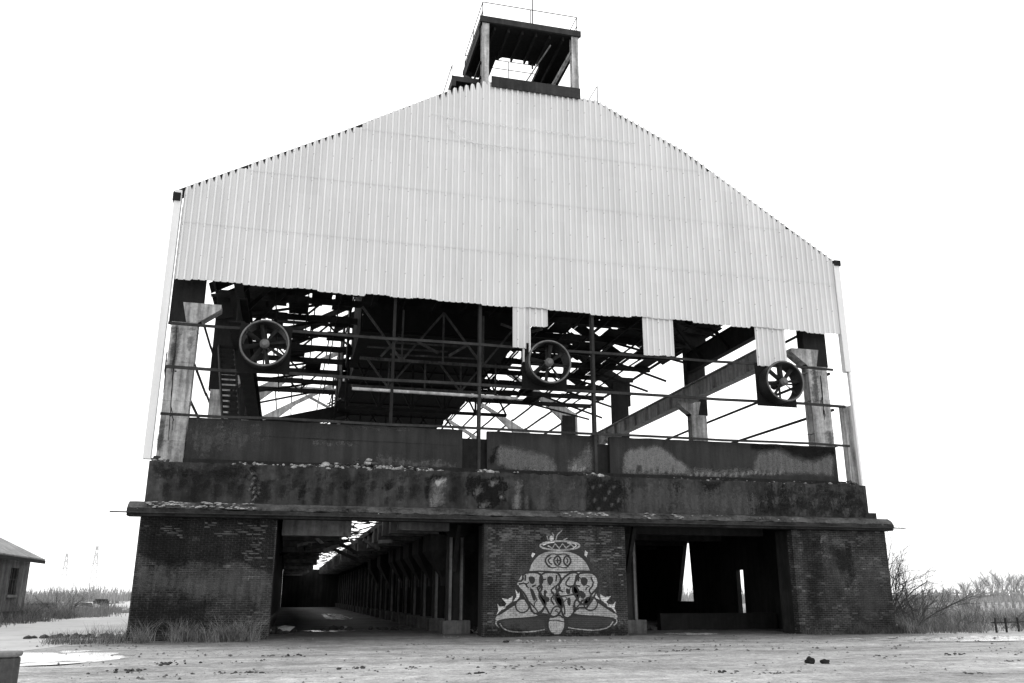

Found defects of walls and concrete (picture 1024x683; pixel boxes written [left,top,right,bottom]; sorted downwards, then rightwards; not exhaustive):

flaking render [465,447,689,587]
flaking render [707,450,833,484]